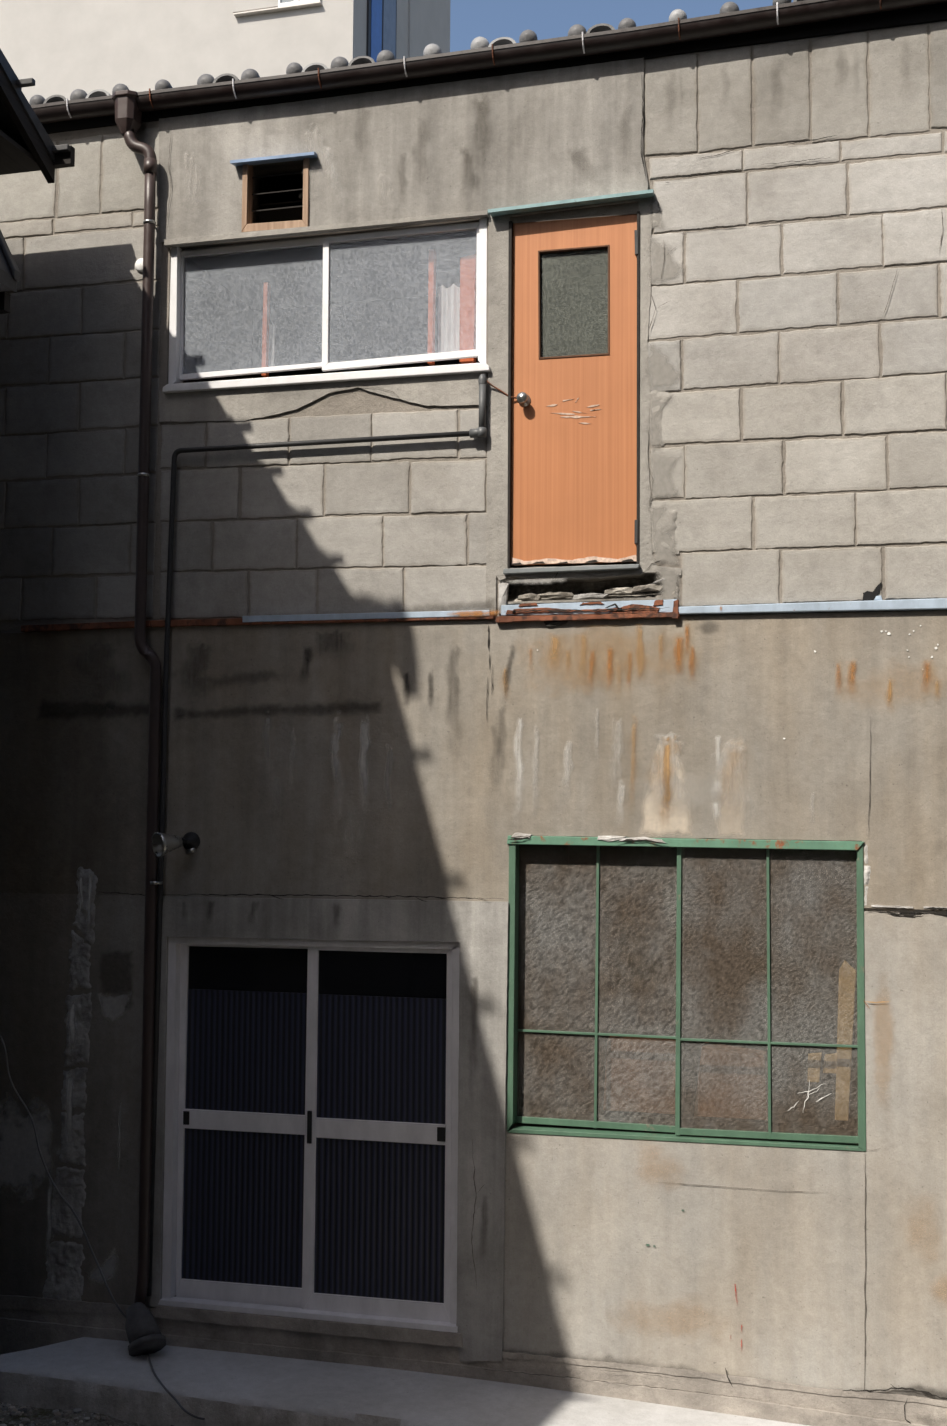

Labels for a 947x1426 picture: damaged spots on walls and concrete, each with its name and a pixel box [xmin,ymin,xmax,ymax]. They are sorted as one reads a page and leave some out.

spalling [496,559,680,627]
water stain [643,733,689,834]
crack [868,907,947,916]